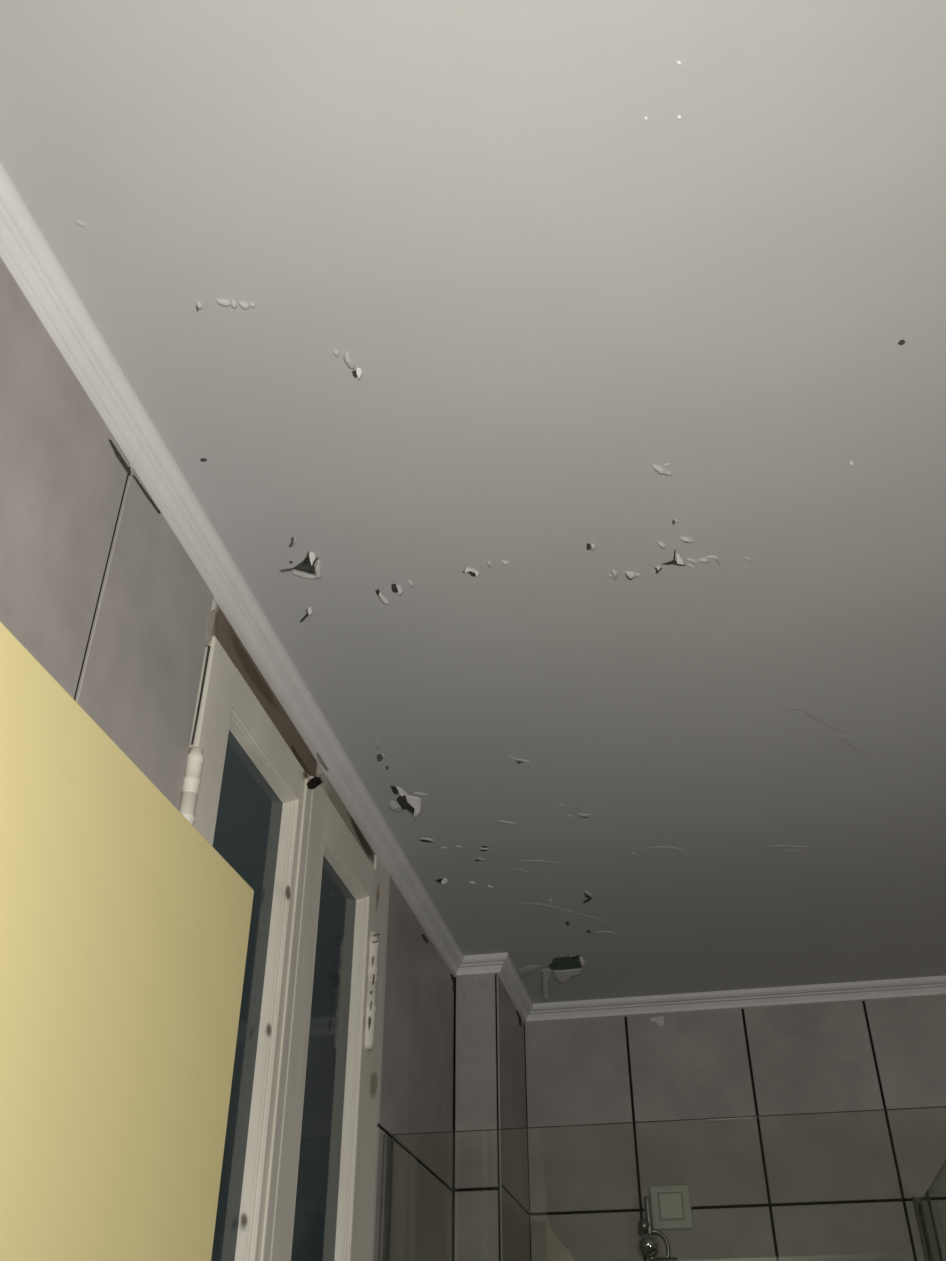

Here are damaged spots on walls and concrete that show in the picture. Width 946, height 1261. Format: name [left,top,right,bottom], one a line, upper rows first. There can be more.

peeling [333,349,363,379]
peeling [279,537,321,579]
peeling [663,519,694,566]
peeling [375,584,403,604]
peeling [388,785,428,820]
peeling [541,955,585,1000]